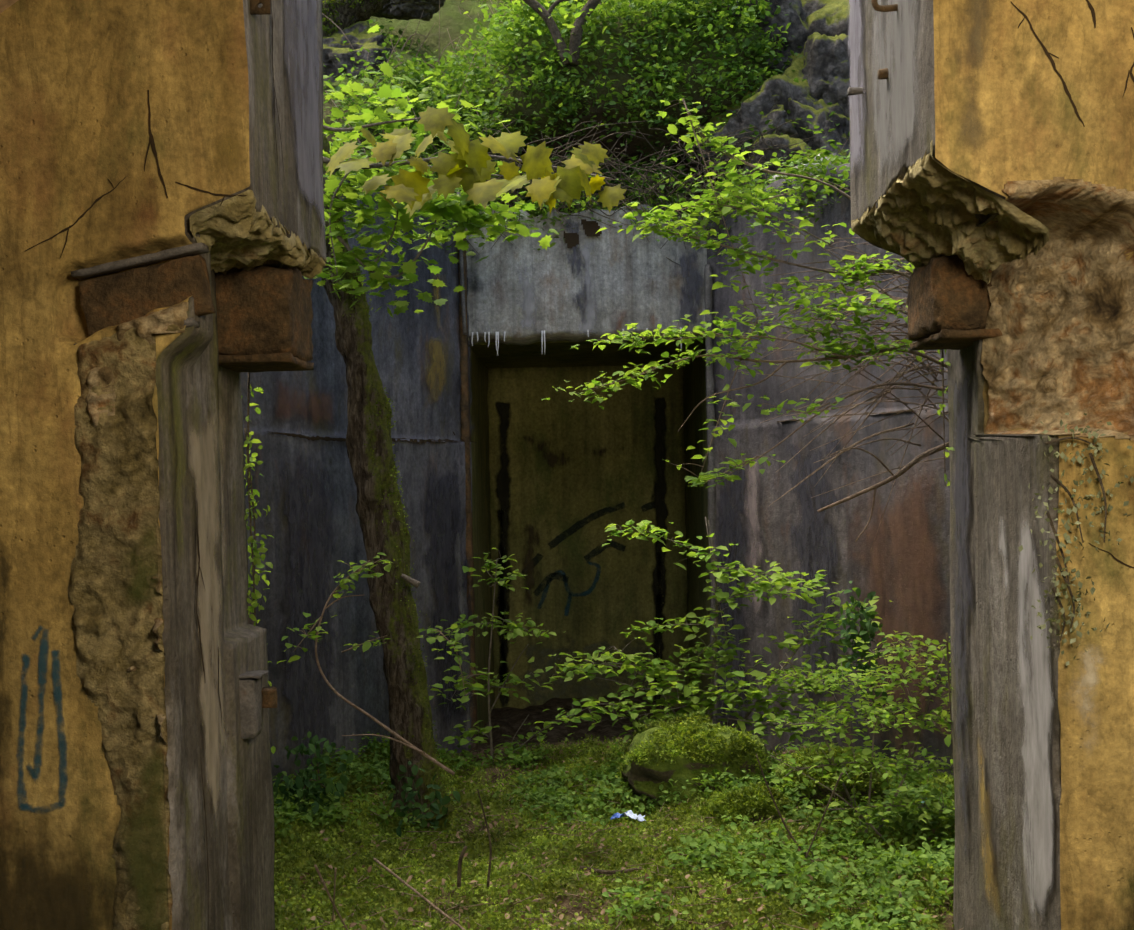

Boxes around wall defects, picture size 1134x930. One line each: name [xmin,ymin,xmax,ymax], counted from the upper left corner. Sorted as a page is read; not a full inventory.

crack [25,90,247,258]
crack [271,3,285,195]
spalling [851,141,1134,440]
crack [1011,2,1085,127]
crack [1086,0,1096,28]
crack [1123,27,1134,96]
spalling [67,302,189,930]
water stain [496,402,540,708]
water stain [522,397,668,705]
rust [857,480,944,726]
water stain [999,520,1053,912]
water stain [0,823,131,930]